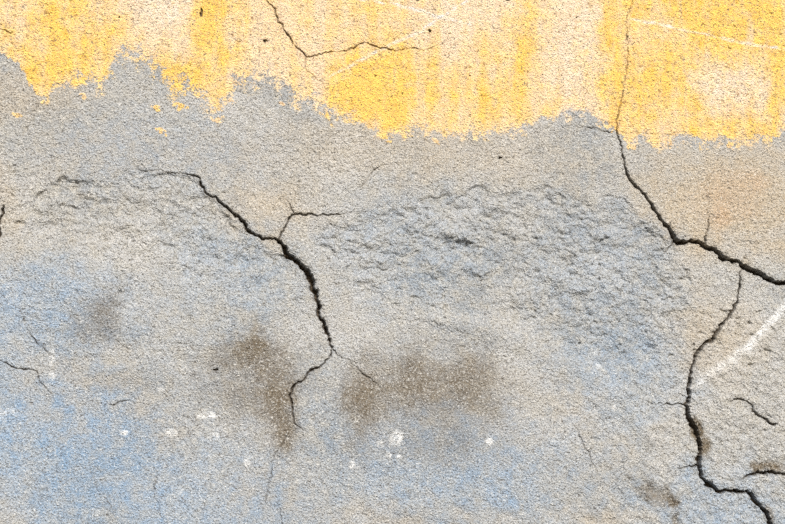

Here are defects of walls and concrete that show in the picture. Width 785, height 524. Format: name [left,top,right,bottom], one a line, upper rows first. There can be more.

crack [263,0,456,96]
peeling [685,63,765,108]
crack [0,200,9,245]
crack [0,309,150,412]
spalling [7,173,302,303]
crack [123,154,406,524]
damp [189,317,530,474]
spalling [313,188,692,388]
crack [552,0,785,524]